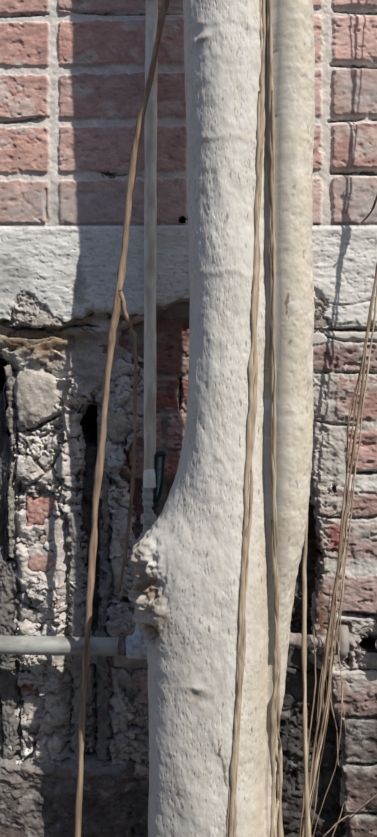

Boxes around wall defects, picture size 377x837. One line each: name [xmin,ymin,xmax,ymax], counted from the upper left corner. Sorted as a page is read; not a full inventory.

spalling [0,292,144,638]
spalling [154,302,190,519]
spalling [0,654,149,779]